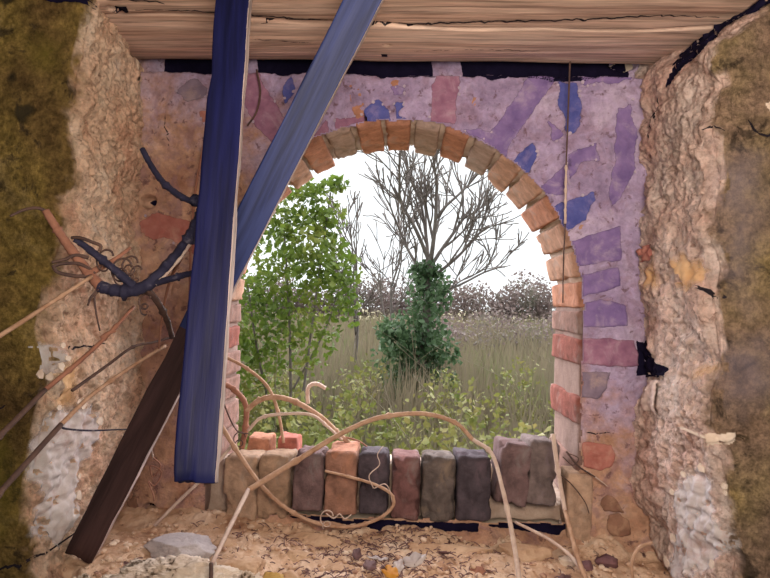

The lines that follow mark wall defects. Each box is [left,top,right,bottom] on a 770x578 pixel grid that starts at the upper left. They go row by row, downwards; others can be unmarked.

crack [130,0,214,13]
crack [251,15,319,43]
crack [372,15,719,26]
crack [748,120,770,137]
spalling [636,245,652,262]
damp [36,342,71,381]
flaking render [640,379,659,414]
spalling [678,426,736,446]